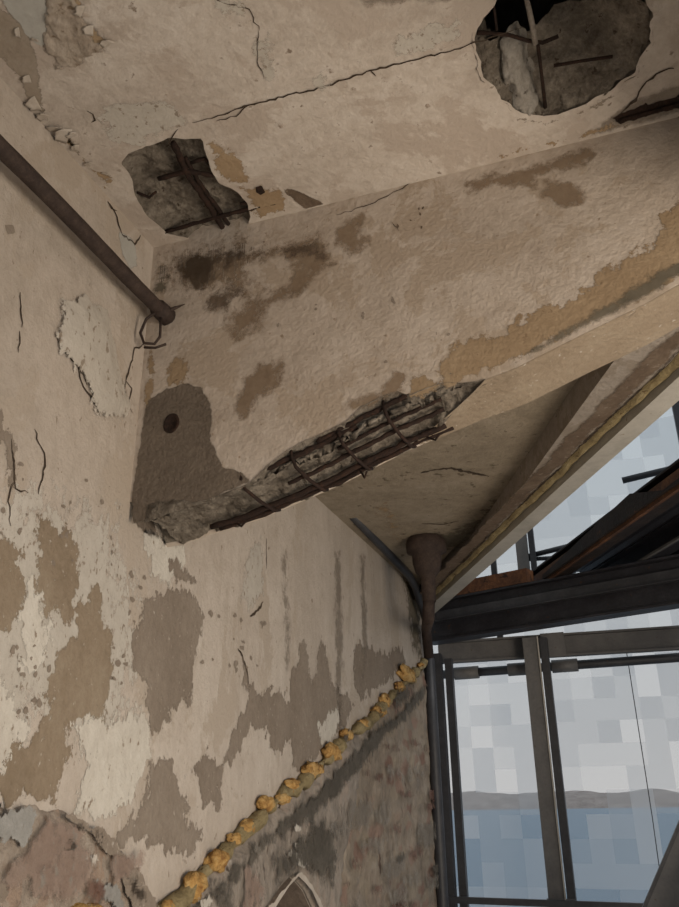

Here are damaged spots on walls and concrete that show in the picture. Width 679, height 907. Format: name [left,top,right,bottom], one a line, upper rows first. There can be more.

spalling [0,0,114,188]
crack [217,0,264,77]
crack [166,26,525,147]
spalling [613,95,679,124]
spalling [122,138,276,238]
water stain [336,214,370,254]
water stain [465,149,596,207]
water stain [154,235,333,341]
spalling [152,203,679,545]
crack [8,430,46,526]
peeling [0,513,220,907]
flaking render [190,638,439,907]